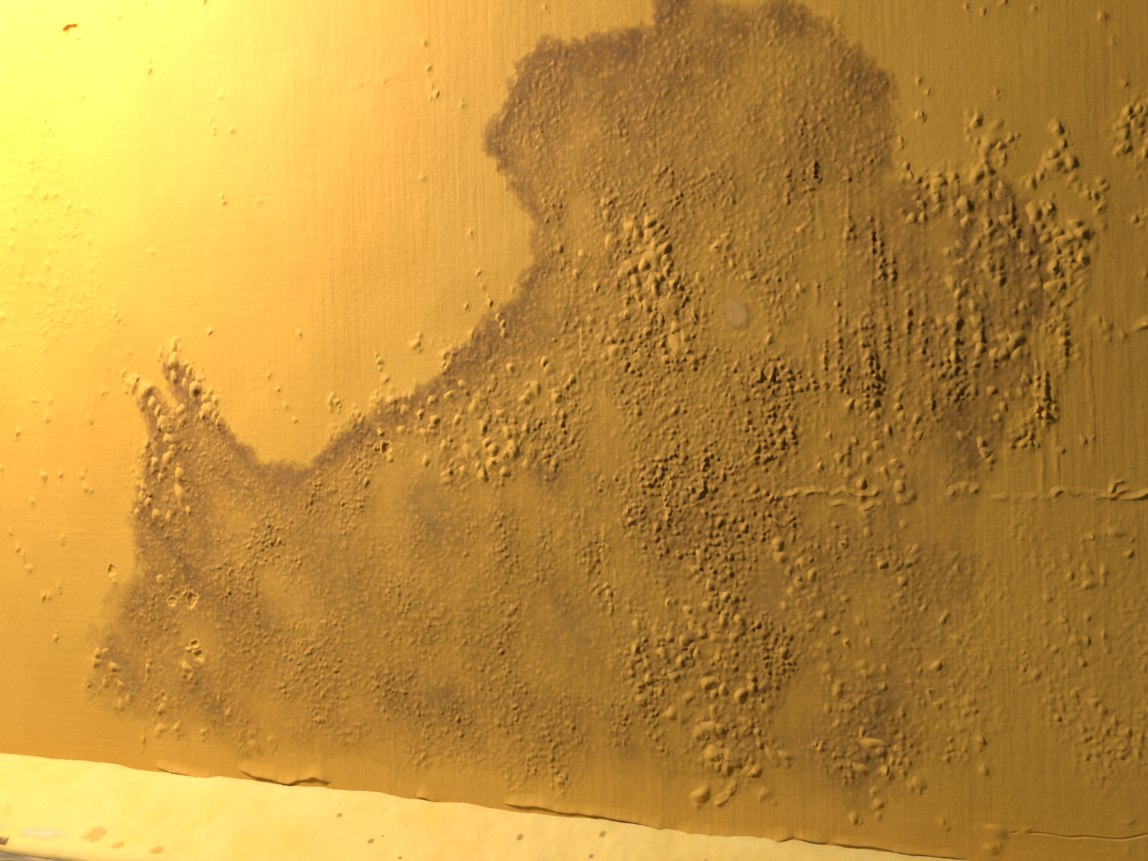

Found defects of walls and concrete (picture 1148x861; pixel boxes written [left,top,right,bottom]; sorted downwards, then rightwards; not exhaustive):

damp [488,0,689,168]
damp [390,267,541,419]
damp [140,395,199,588]
damp [174,369,374,488]